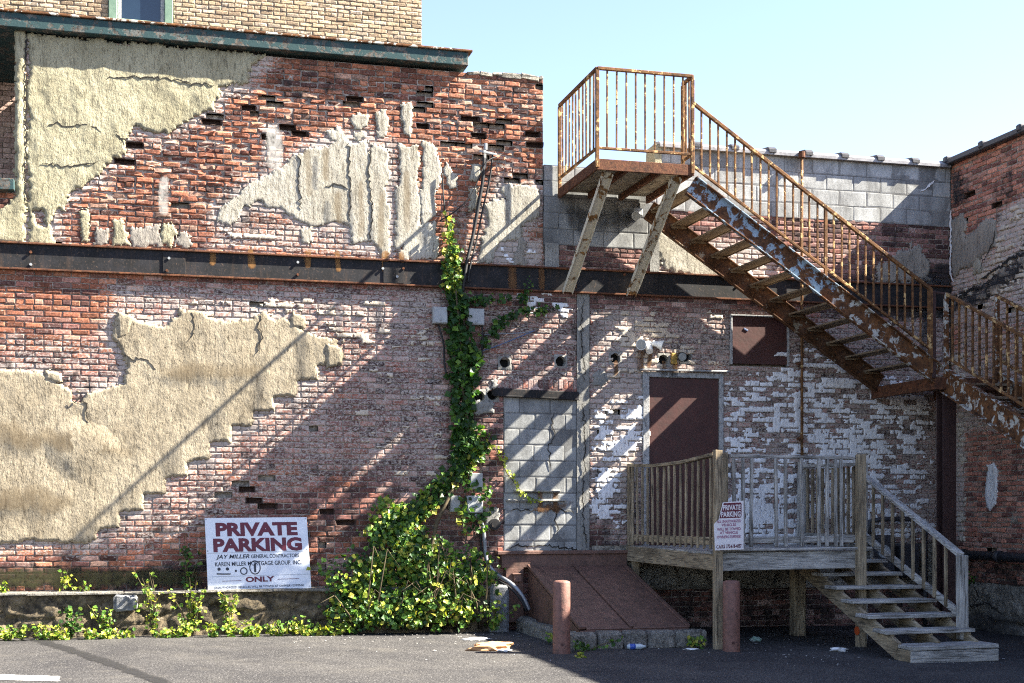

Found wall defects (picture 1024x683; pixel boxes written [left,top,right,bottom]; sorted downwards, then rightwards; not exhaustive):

crack [23,39,127,204]
flaking render [0,30,266,249]
crack [106,75,214,86]
flaking render [216,95,544,266]
flaking render [0,297,391,545]
peeling [392,328,442,361]
peeling [410,396,441,406]
peeling [426,431,448,477]
crack [510,298,587,550]
corrosion [637,350,677,376]
peeling [724,348,936,545]